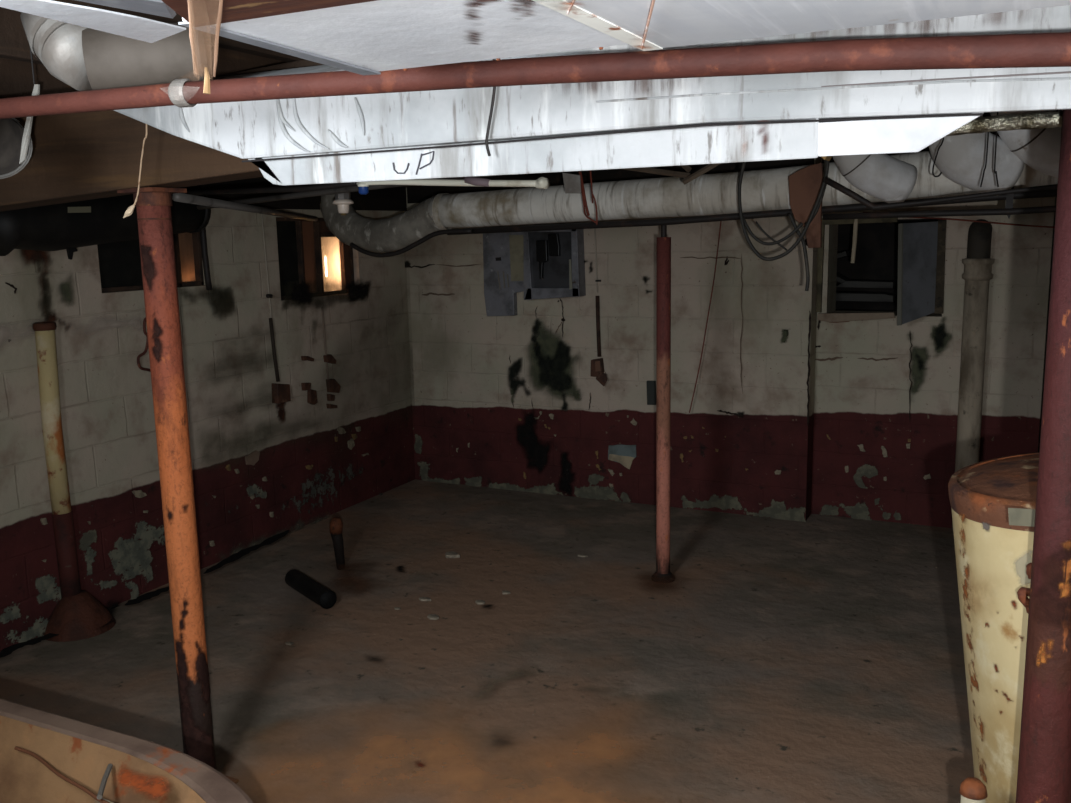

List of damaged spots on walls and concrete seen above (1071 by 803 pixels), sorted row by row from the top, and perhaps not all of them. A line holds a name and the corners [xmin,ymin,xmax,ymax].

leakage [508,320,580,411]
leakage [909,318,951,420]
peeling [588,445,636,489]
peeling [845,444,888,489]
peeling [78,490,172,600]
corrosion [948,452,1039,620]
peeling [0,559,61,645]